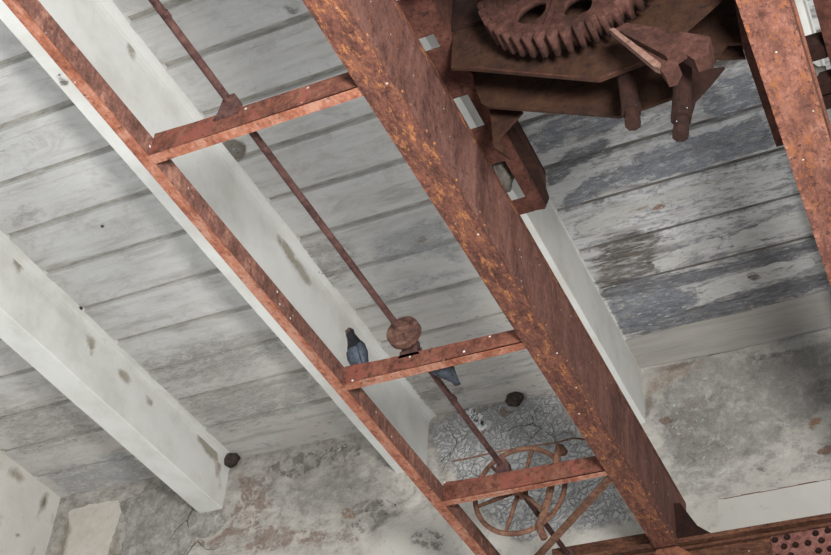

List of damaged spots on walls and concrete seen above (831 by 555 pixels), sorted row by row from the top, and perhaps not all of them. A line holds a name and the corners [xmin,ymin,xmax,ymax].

peeling [528,115,625,185]
peeling [562,73,774,211]
peeling [594,210,831,368]
crack [169,508,223,555]
spalling [62,443,360,555]
crack [723,479,830,499]